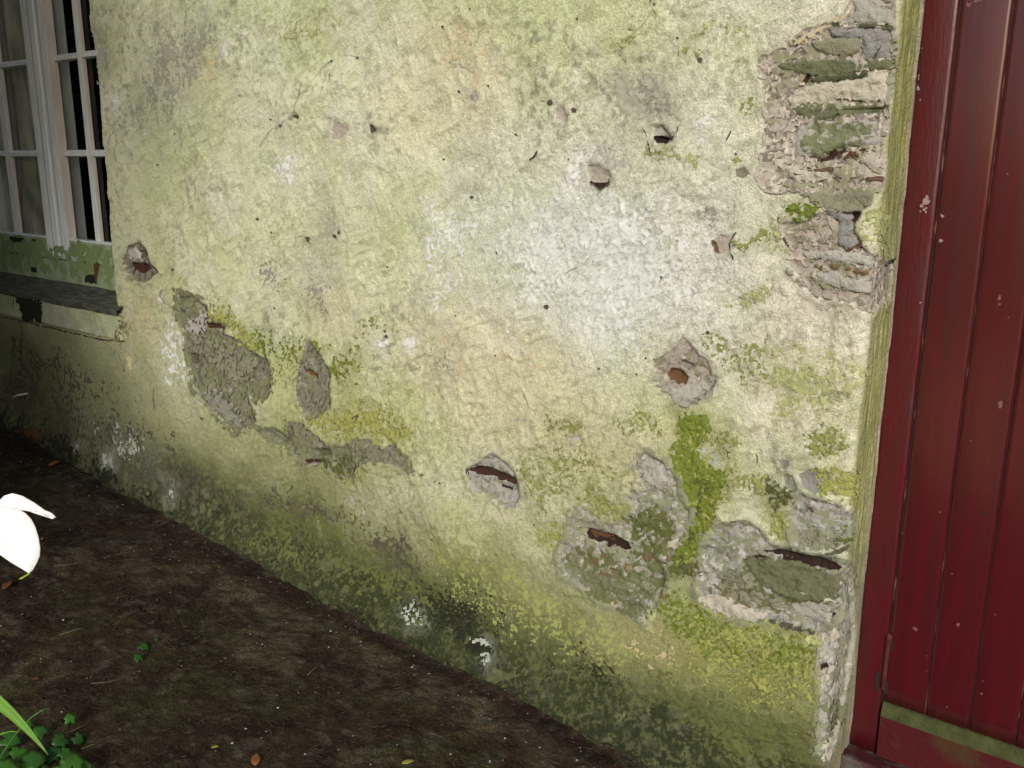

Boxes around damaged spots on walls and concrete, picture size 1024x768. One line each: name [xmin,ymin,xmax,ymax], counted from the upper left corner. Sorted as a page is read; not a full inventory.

spalling [736,0,900,314]
spalling [123,242,158,282]
leakage [124,283,190,386]
spalling [171,287,415,480]
spalling [653,337,718,407]
leakage [0,396,232,540]
leakage [257,479,372,527]
spalling [465,453,520,508]
leakage [231,532,712,768]
spalling [551,447,859,764]